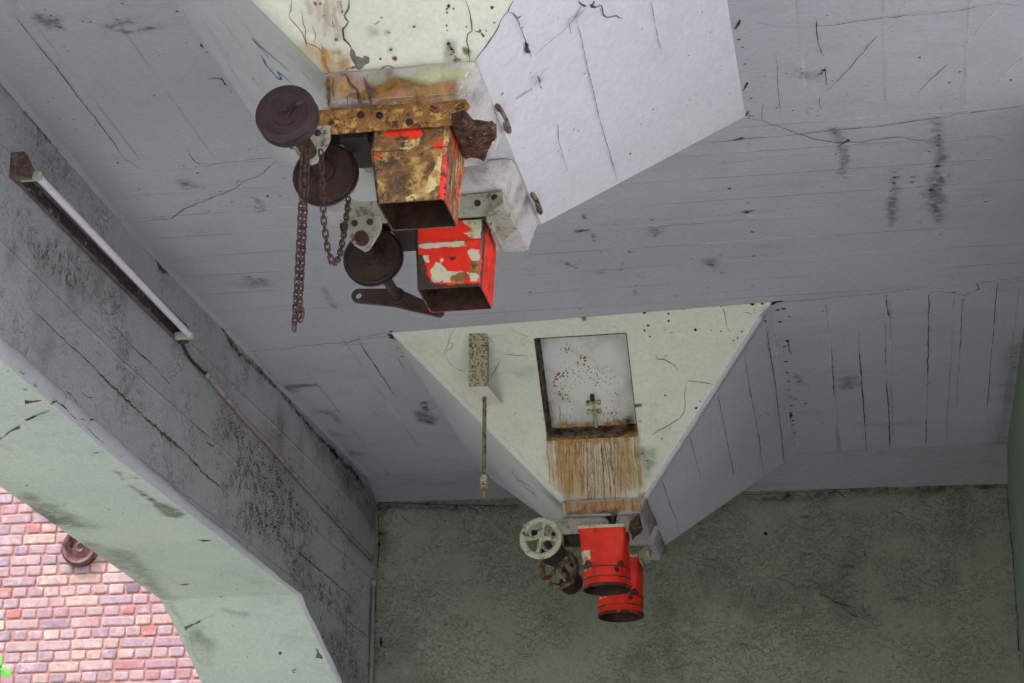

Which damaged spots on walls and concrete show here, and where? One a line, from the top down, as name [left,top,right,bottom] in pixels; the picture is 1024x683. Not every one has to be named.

crack [15,16,136,166]
crack [465,0,623,182]
crack [709,3,1020,147]
crack [140,151,275,223]
crack [0,308,219,486]
water stain [222,328,364,488]
corrosion [546,343,642,514]
crack [723,277,1021,461]